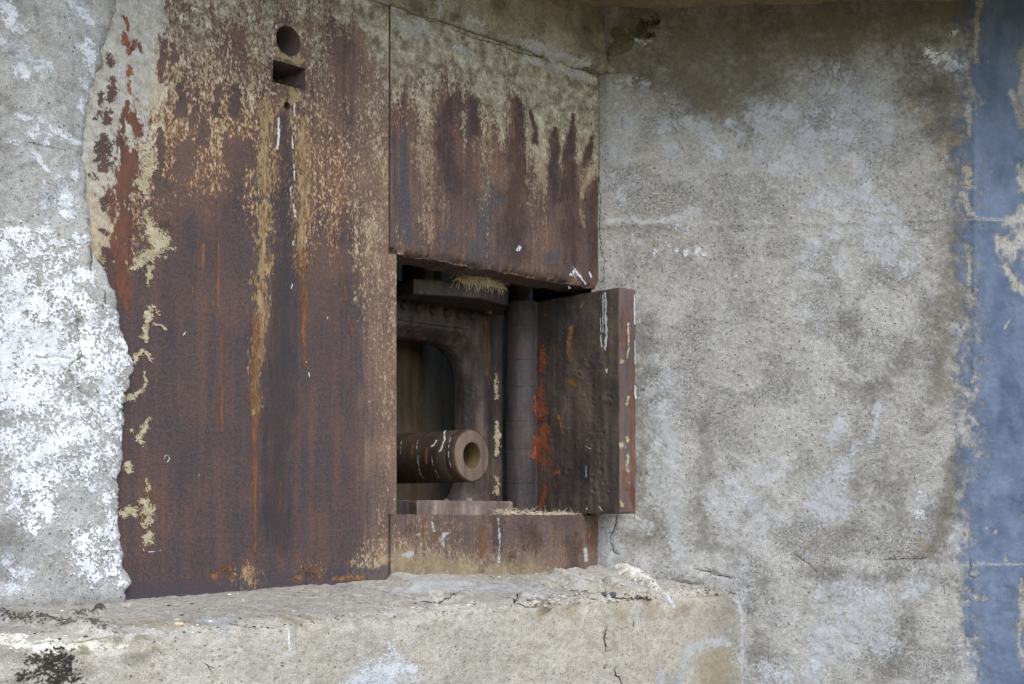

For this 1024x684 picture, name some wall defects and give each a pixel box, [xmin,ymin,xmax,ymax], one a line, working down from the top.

damp [0,0,54,82]
damp [0,112,133,596]
damp [64,0,100,115]
corrosion [88,15,145,312]
corrosion [247,86,301,552]
corrosion [275,53,305,65]
corrosion [293,118,311,370]
corrosion [525,342,564,511]
spalling [628,12,661,46]
damp [511,0,972,280]
peeling [953,0,1024,684]
crack [552,580,652,627]